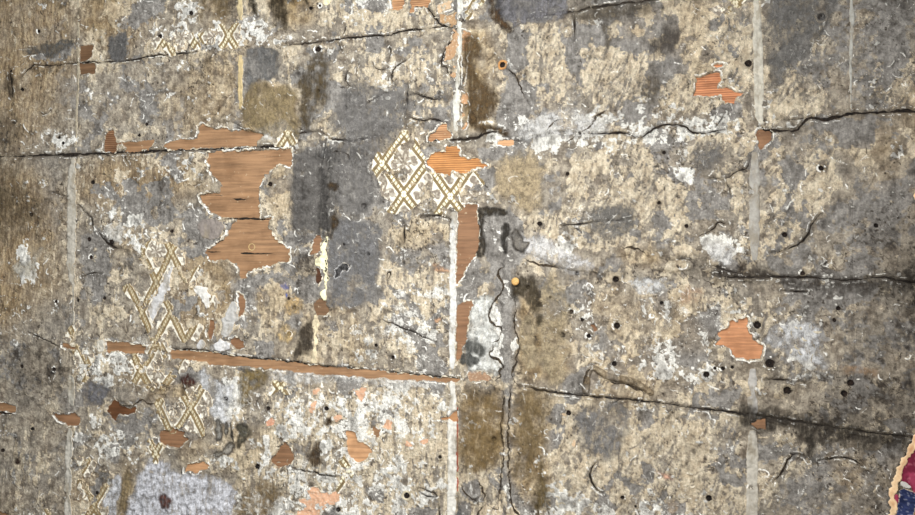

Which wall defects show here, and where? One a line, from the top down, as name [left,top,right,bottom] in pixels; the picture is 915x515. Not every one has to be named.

crack [763,109,915,133]
crack [0,131,368,163]
peeling [104,122,493,402]
crack [522,386,913,438]
crack [773,453,798,482]
crack [822,457,863,468]